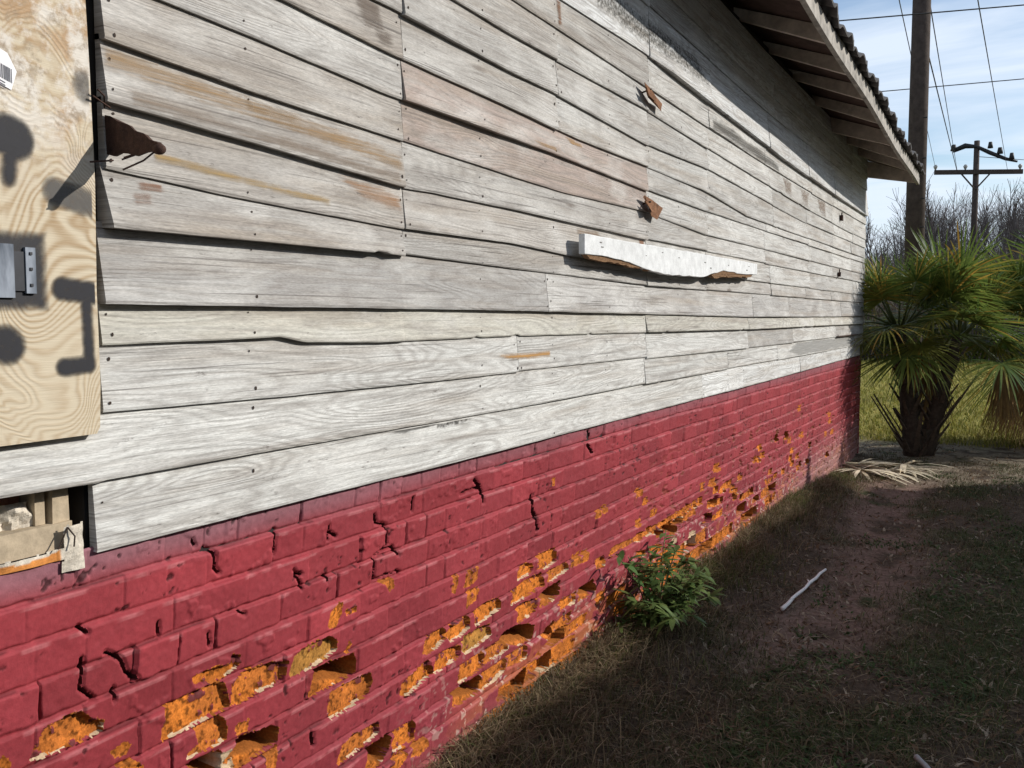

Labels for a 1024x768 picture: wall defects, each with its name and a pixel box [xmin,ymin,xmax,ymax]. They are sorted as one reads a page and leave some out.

flaking render [0,501,33,531]
crack [461,478,484,503]
crack [528,493,540,531]
flaking render [0,521,85,575]
crack [191,538,219,573]
crack [293,572,328,588]
crack [370,513,398,578]
spalling [399,431,812,737]
crack [75,625,138,700]
spalling [161,601,357,760]
spalling [30,710,105,761]
spalling [336,720,429,768]